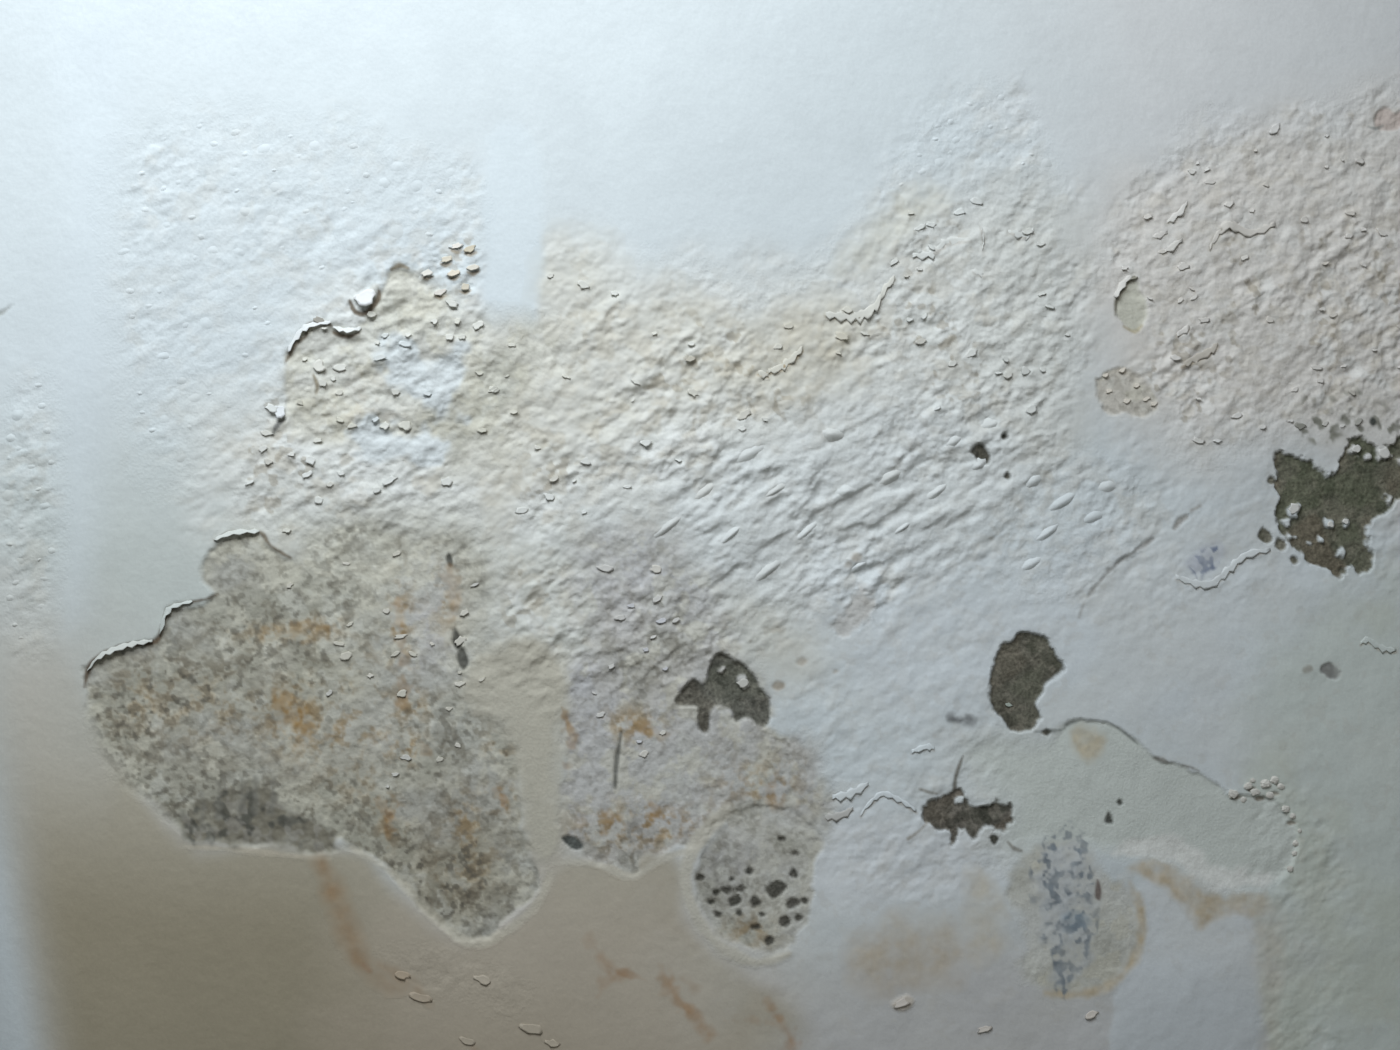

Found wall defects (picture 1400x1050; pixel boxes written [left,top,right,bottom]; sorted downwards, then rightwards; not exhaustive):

crack [0,303,15,320]
water stain [475,172,955,534]
peeling [633,73,1400,581]
water stain [1293,384,1400,448]
water stain [411,467,453,495]
peeling [79,242,851,970]
peeling [827,551,879,641]
water stain [1181,537,1229,581]
water stain [176,771,340,857]
peeling [905,631,1302,1020]